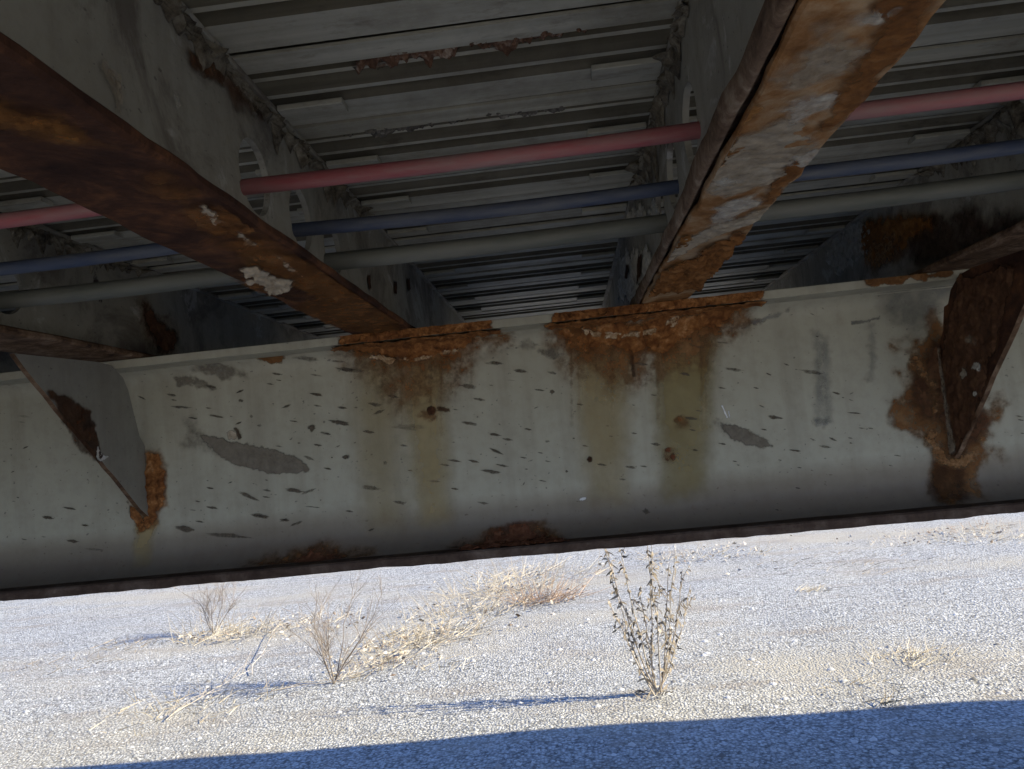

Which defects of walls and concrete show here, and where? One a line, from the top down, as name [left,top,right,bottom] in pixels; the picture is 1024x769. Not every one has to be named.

peeling [189,50,263,118]
rust [819,0,937,131]
rust [760,161,808,206]
rust [142,300,179,354]
peeling [240,257,320,302]
rust [188,210,510,515]
rust [544,231,767,490]
rust [864,265,1015,505]
rust [127,451,167,551]
rust [451,522,570,550]